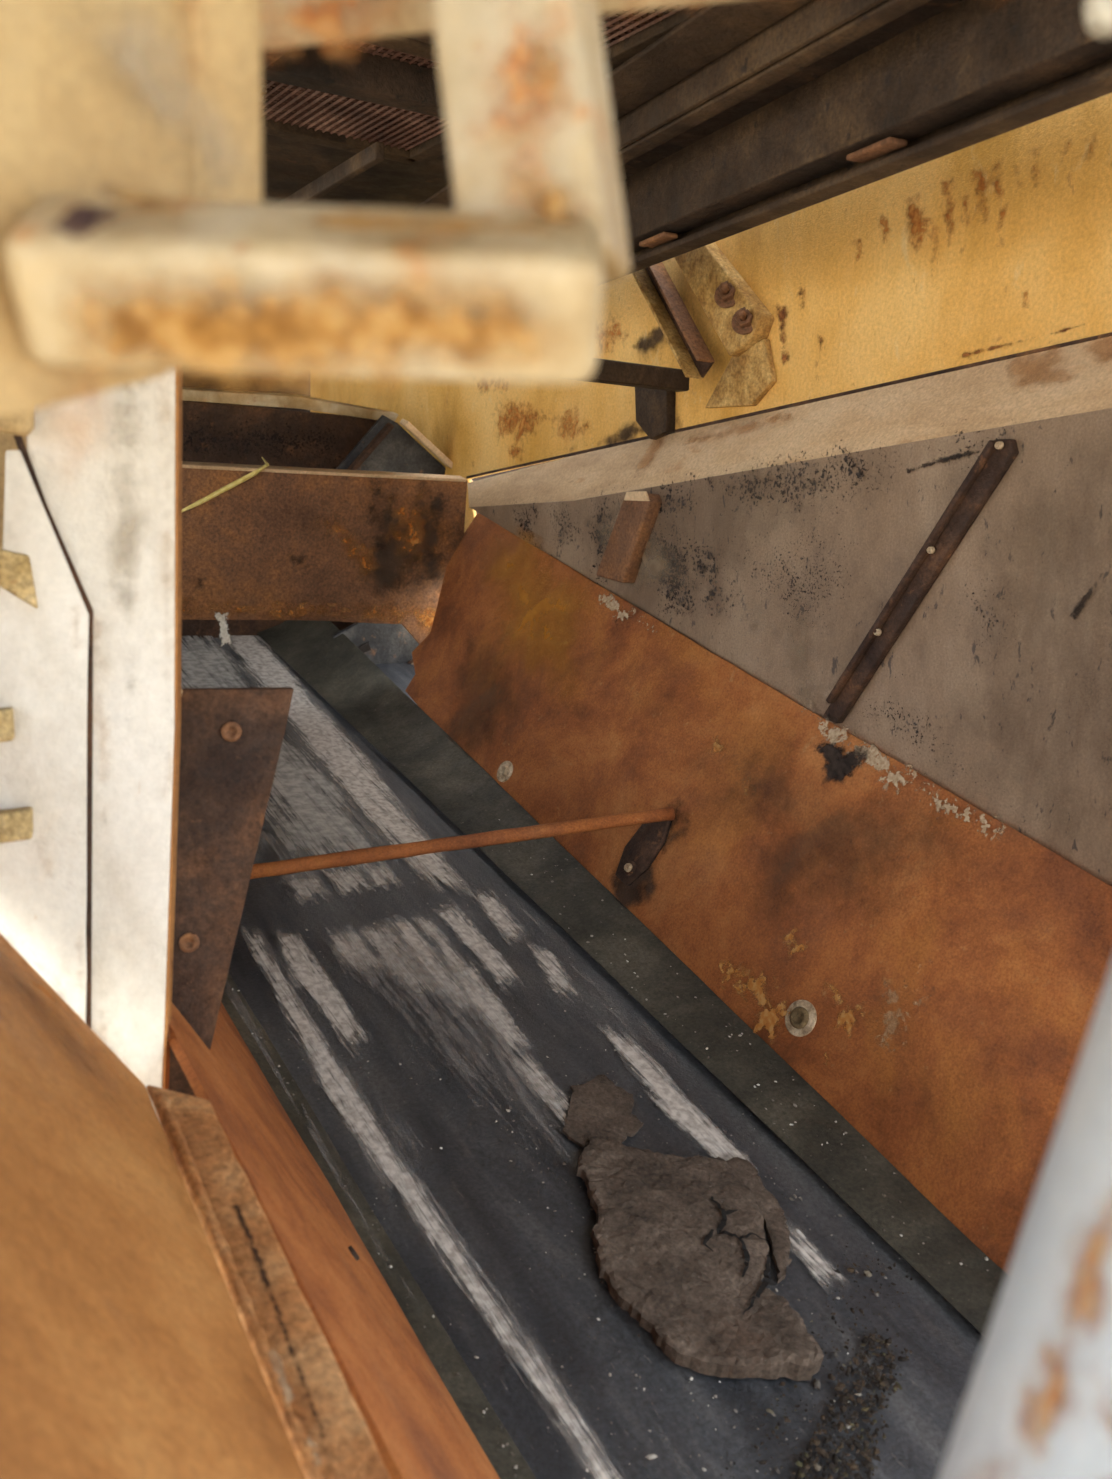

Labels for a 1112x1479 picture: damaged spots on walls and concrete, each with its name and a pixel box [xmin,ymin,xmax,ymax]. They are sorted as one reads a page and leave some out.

rust [907,163,1005,250]
rust [82,272,543,389]
rust [498,405,538,457]
peeling [801,707,1005,839]
peeling [719,961,790,1039]
peeling [830,985,863,1034]
rust [1068,1217,1109,1321]
rust [1022,1348,1065,1442]